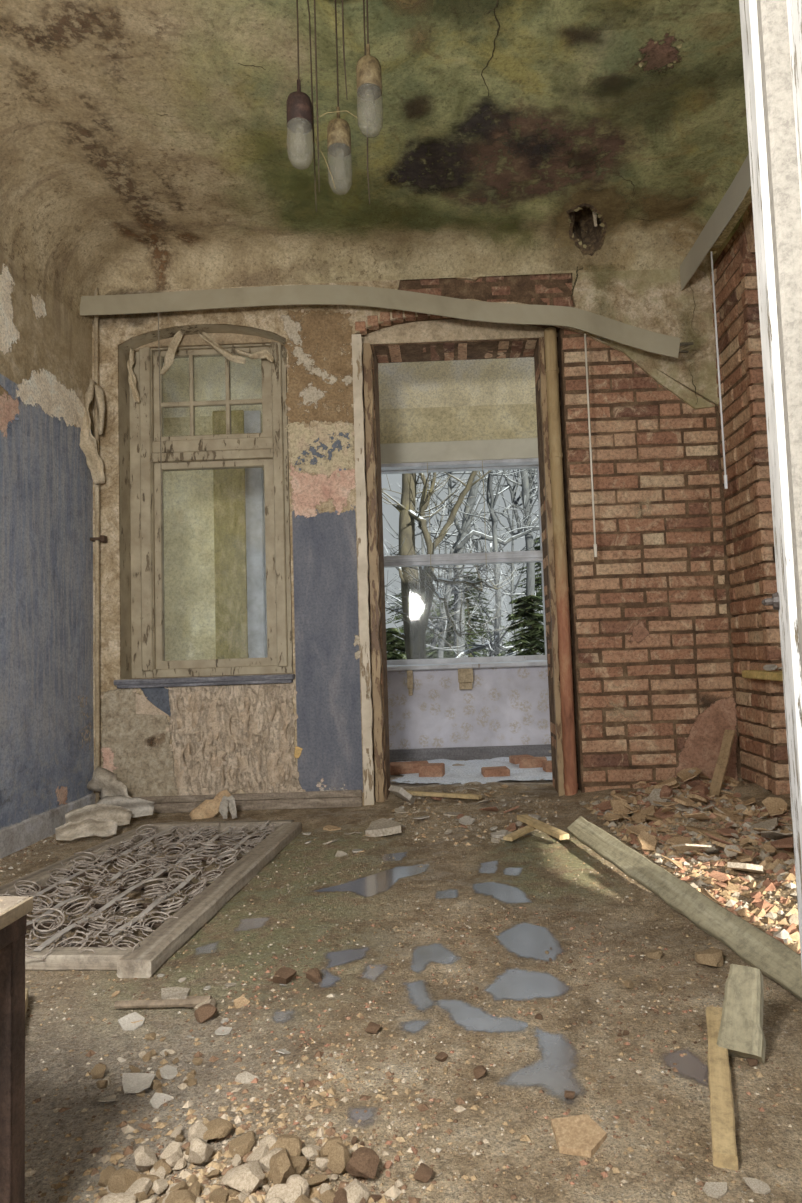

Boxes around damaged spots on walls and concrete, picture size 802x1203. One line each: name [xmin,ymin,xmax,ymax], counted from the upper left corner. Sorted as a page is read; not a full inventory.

peeling [0,259,20,355]
peeling [31,294,47,320]
peeling [0,368,85,438]